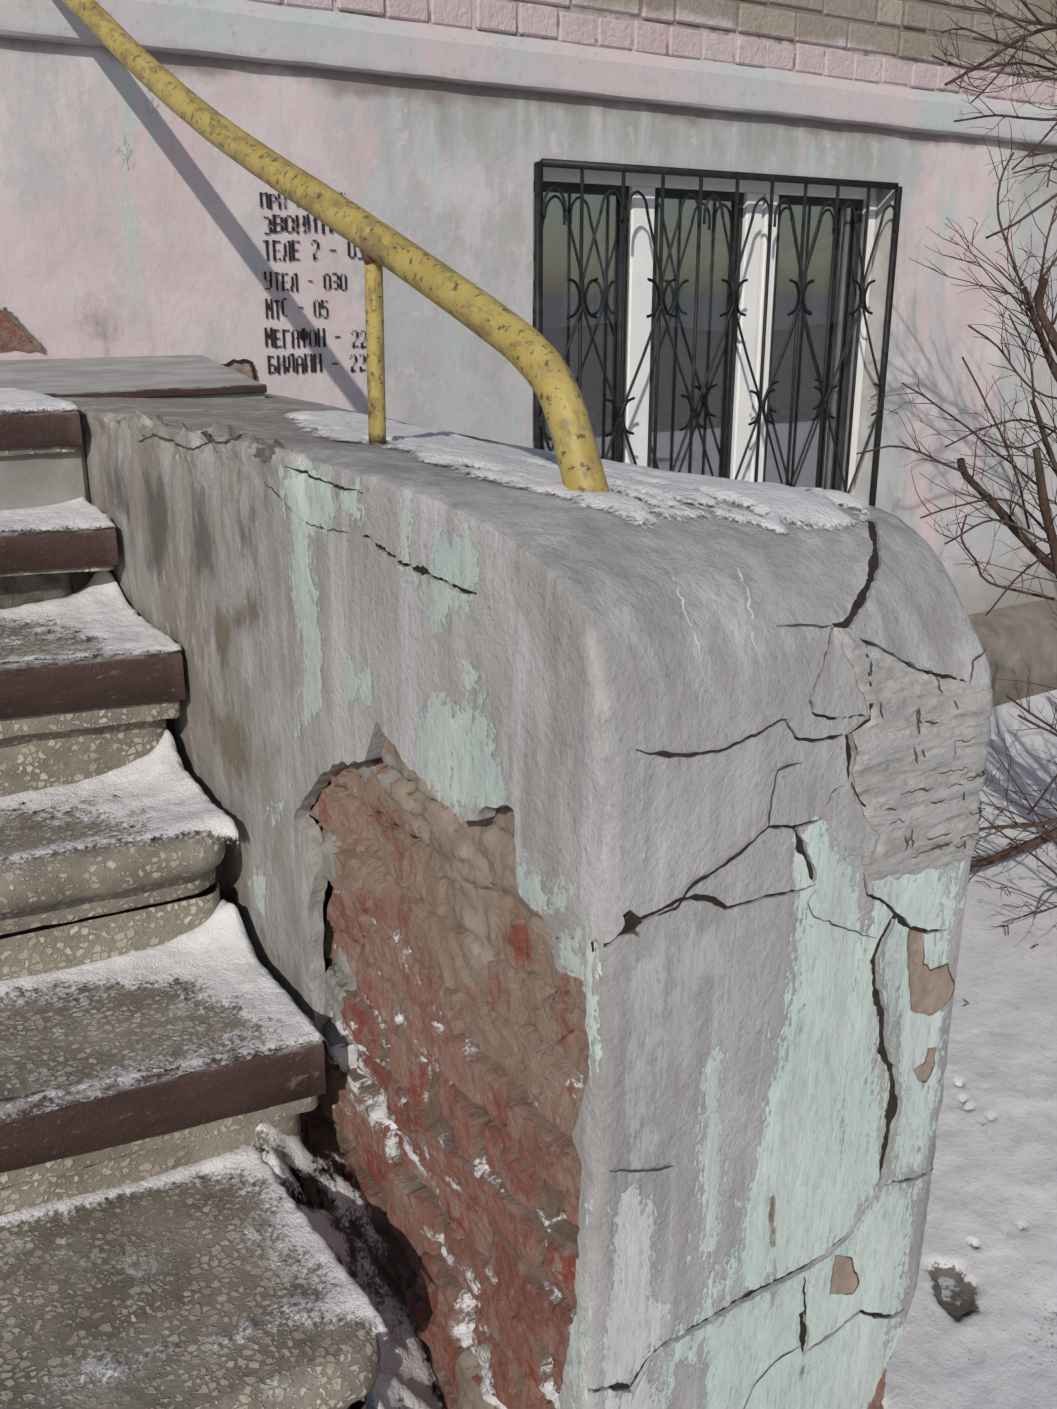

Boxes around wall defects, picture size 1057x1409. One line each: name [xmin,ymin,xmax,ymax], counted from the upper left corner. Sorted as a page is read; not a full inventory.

spalling [0,307,43,352]
crack [264,466,477,595]
peeling [391,498,486,638]
crack [556,519,986,1186]
spalling [296,651,970,1409]
crack [588,1237,843,1409]
crack [860,1309,897,1317]